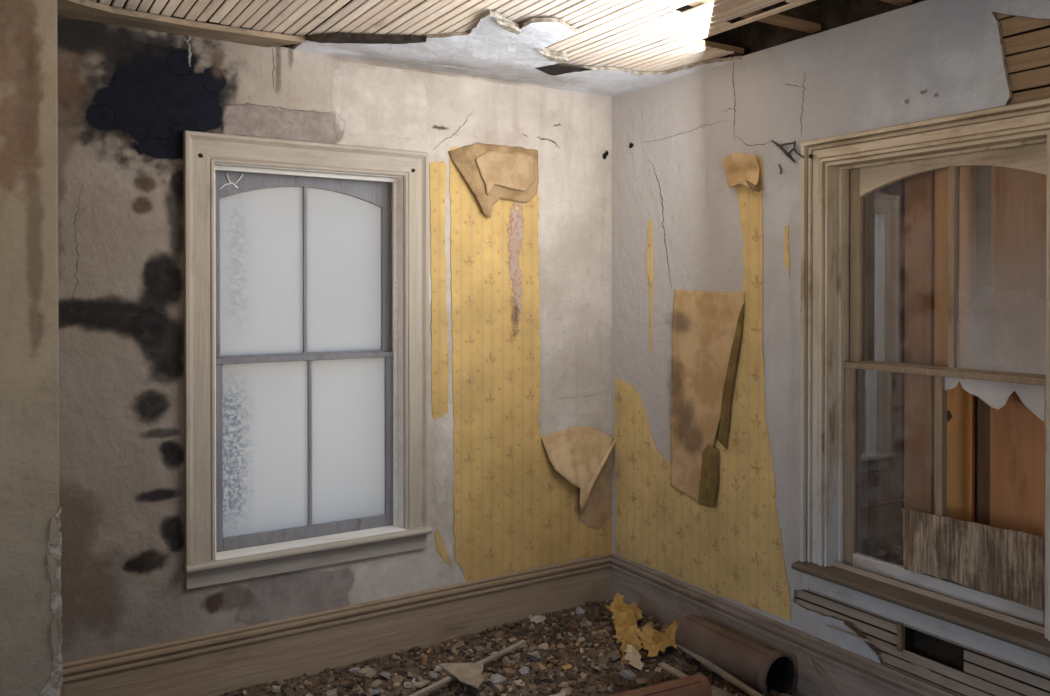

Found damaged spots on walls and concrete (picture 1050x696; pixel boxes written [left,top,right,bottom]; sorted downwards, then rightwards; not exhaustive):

flaking render [89,0,815,76]
crack [644,63,773,285]
leakage [57,17,237,467]
leakage [138,489,176,501]
mould [125,517,184,573]
flaking render [832,561,1045,634]
flaking render [796,590,1050,696]